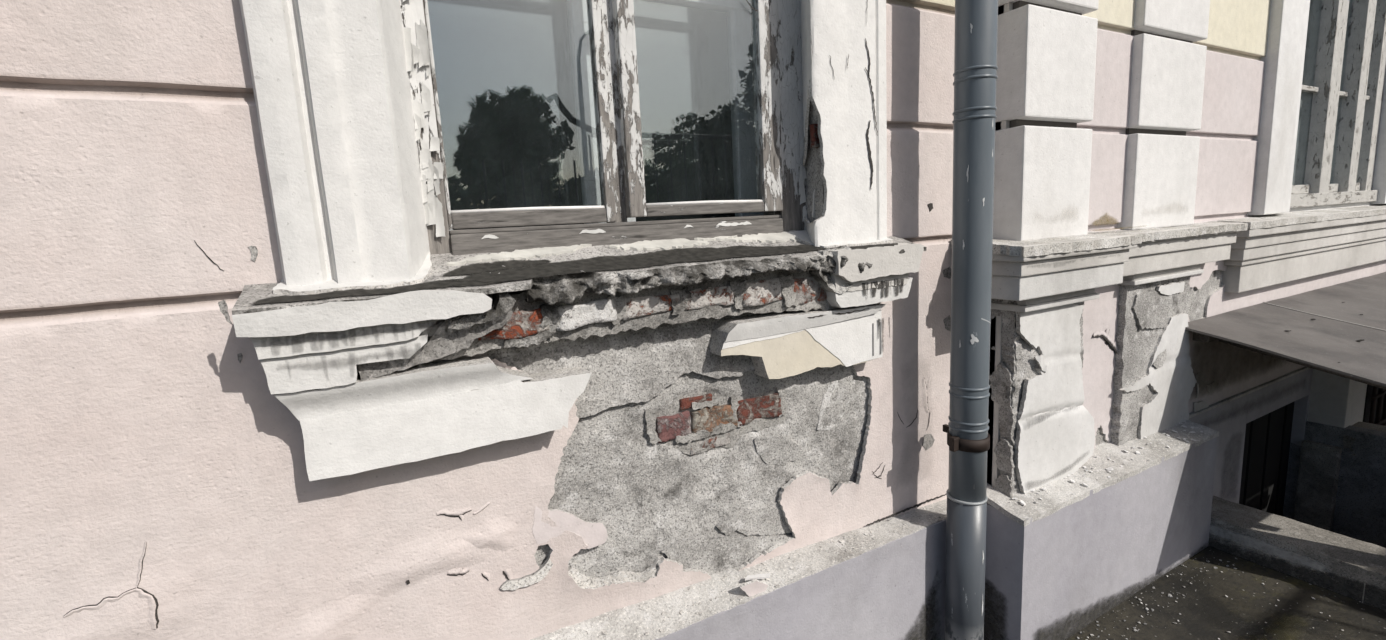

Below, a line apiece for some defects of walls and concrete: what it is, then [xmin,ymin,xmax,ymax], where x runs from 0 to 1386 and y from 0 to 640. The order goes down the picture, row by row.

peeling [400,0,446,237]
spalling [358,100,873,590]
spalling [944,299,1047,498]
spalling [1073,301,1084,368]
spalling [1095,270,1223,446]
crack [63,542,159,629]